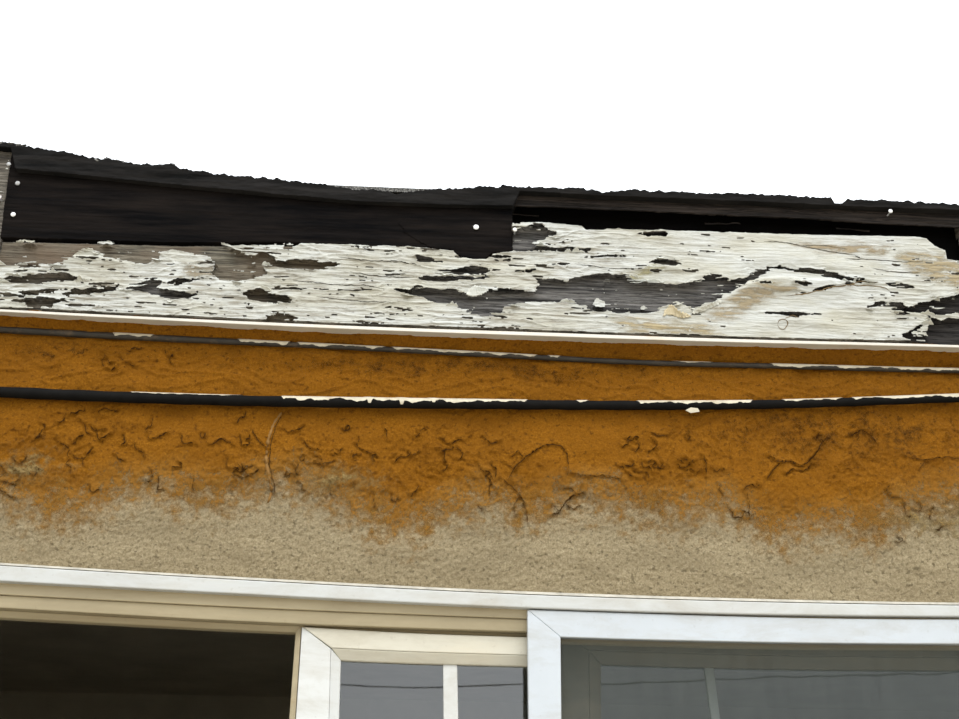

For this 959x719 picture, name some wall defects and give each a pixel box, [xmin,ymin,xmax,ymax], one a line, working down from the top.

peeling [0,152,340,323]
peeling [394,223,771,319]
peeling [866,294,959,345]
crack [0,408,264,499]
crack [284,425,828,526]
crack [886,486,943,543]